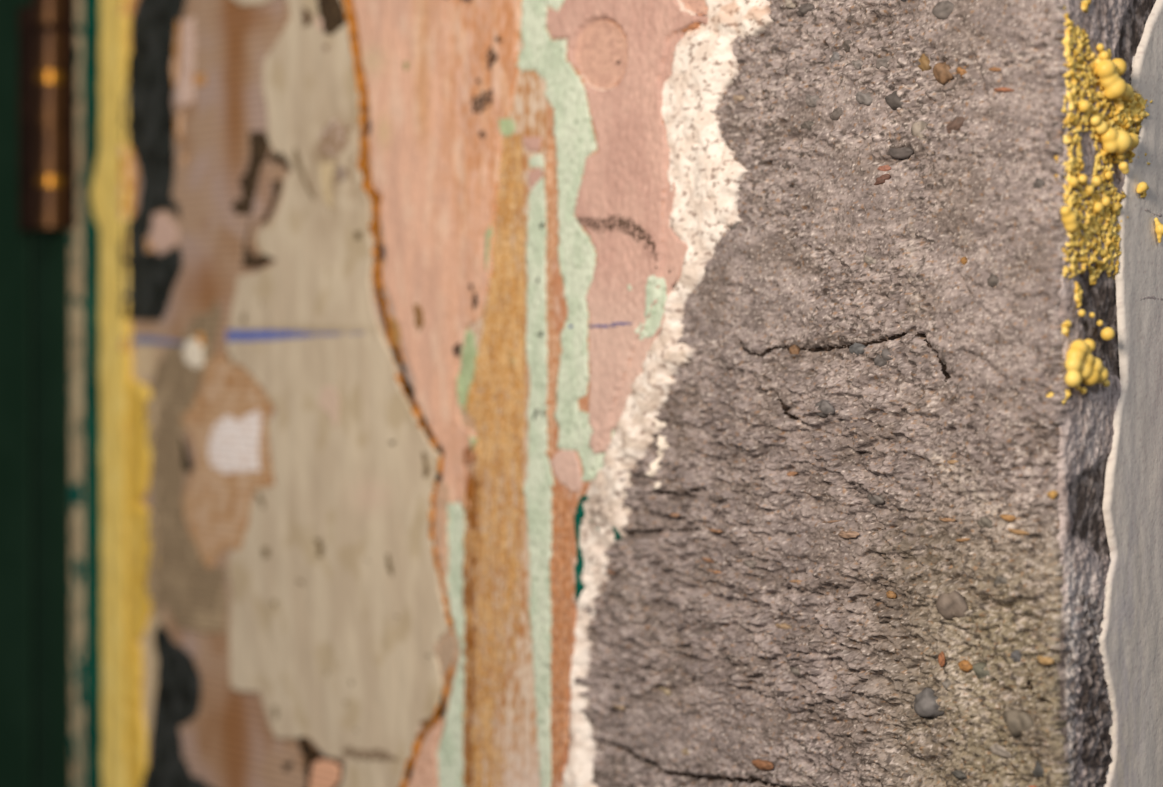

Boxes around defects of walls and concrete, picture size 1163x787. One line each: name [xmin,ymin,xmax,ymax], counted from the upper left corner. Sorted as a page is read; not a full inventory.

peeling [176,17,195,134]
peeling [149,213,178,253]
flaking render [182,333,204,370]
crack [739,331,951,382]
spalling [226,0,1156,787]
crack [755,385,808,425]
flaking render [208,410,261,474]
crack [598,740,792,787]